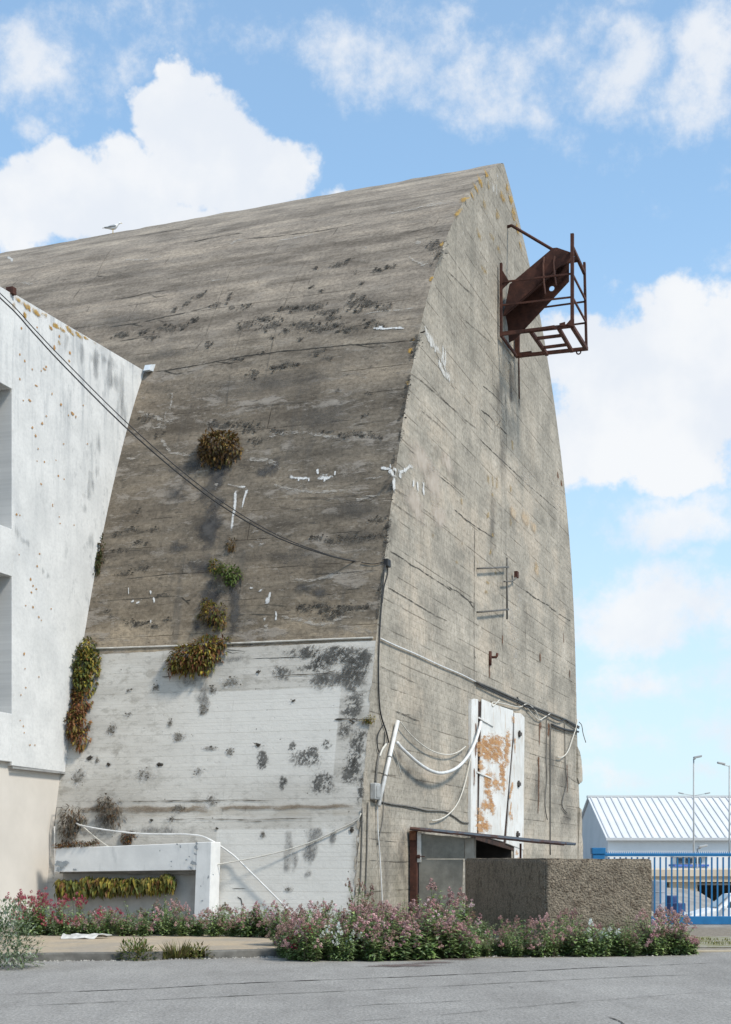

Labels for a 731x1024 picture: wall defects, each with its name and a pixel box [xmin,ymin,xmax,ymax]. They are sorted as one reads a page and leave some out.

leakage [83,806,204,836]
leakage [224,645,371,810]
corrosion [474,717,516,833]